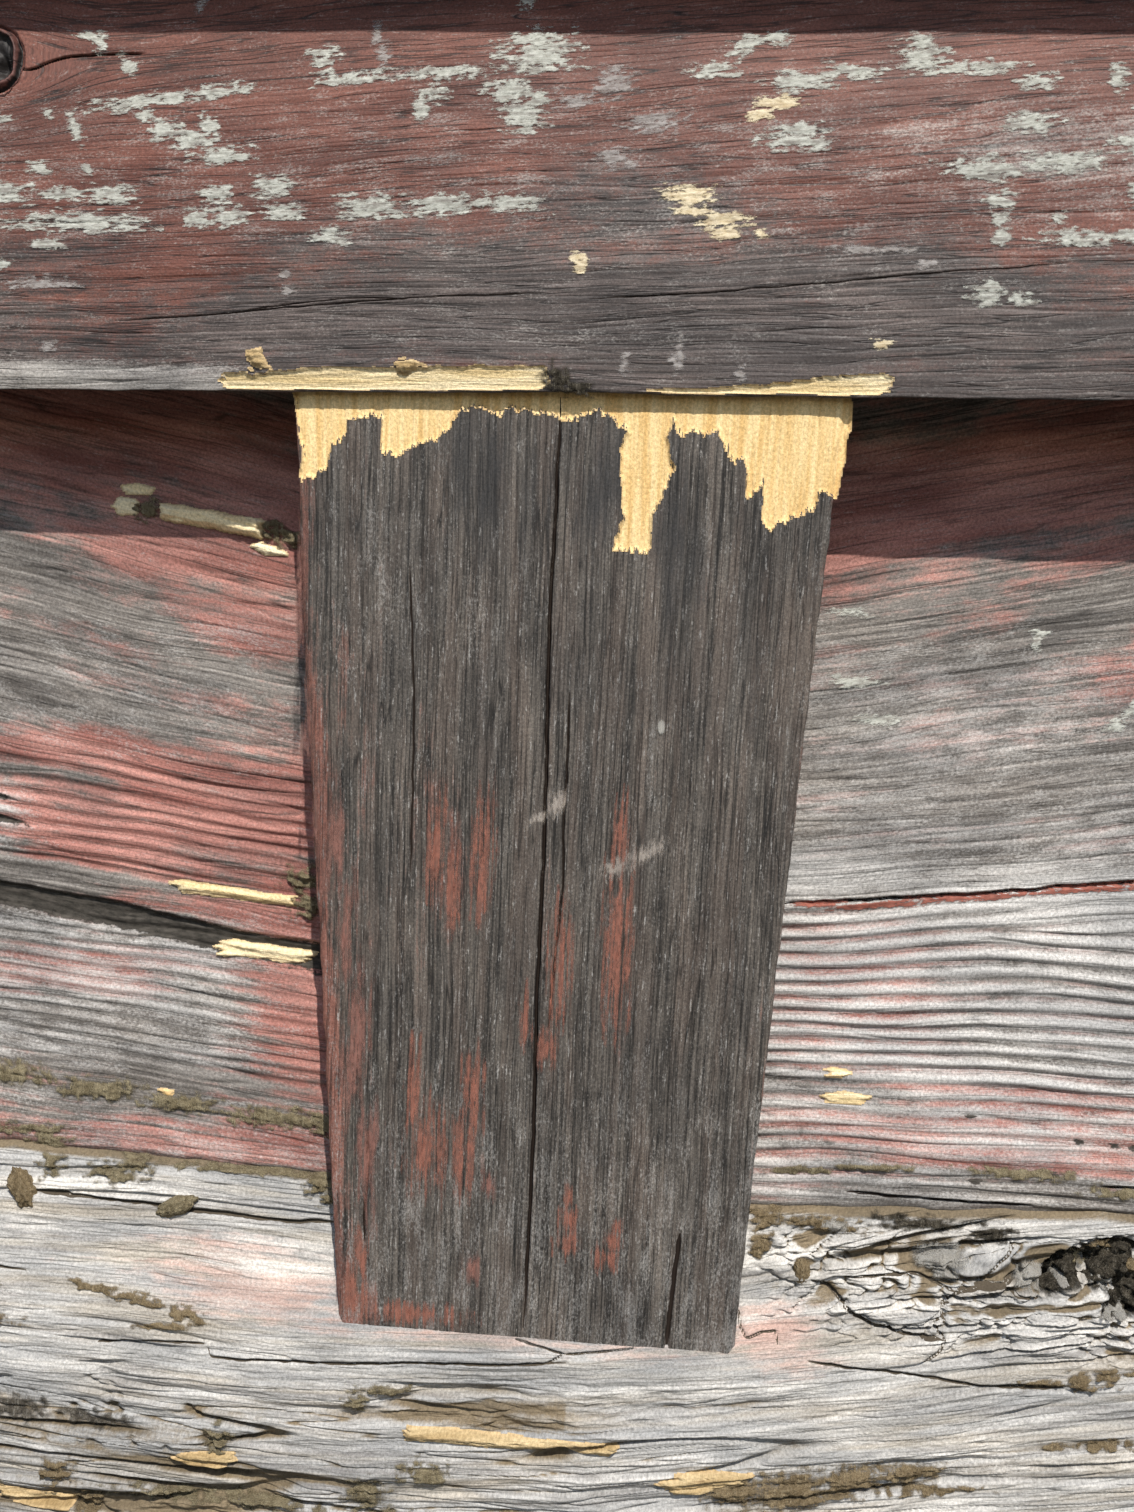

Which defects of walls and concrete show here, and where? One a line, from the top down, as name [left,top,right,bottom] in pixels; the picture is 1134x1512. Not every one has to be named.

peeling [303,0,640,135]
peeling [684,29,1064,153]
peeling [0,30,556,250]
peeling [929,61,1134,247]
spalling [653,182,768,240]
peeling [0,258,80,289]
crack [115,293,541,321]
peeling [568,250,590,274]
peeling [961,277,1042,308]
spalling [218,335,895,554]
crack [785,880,1134,904]
spalling [1039,1237,1134,1322]